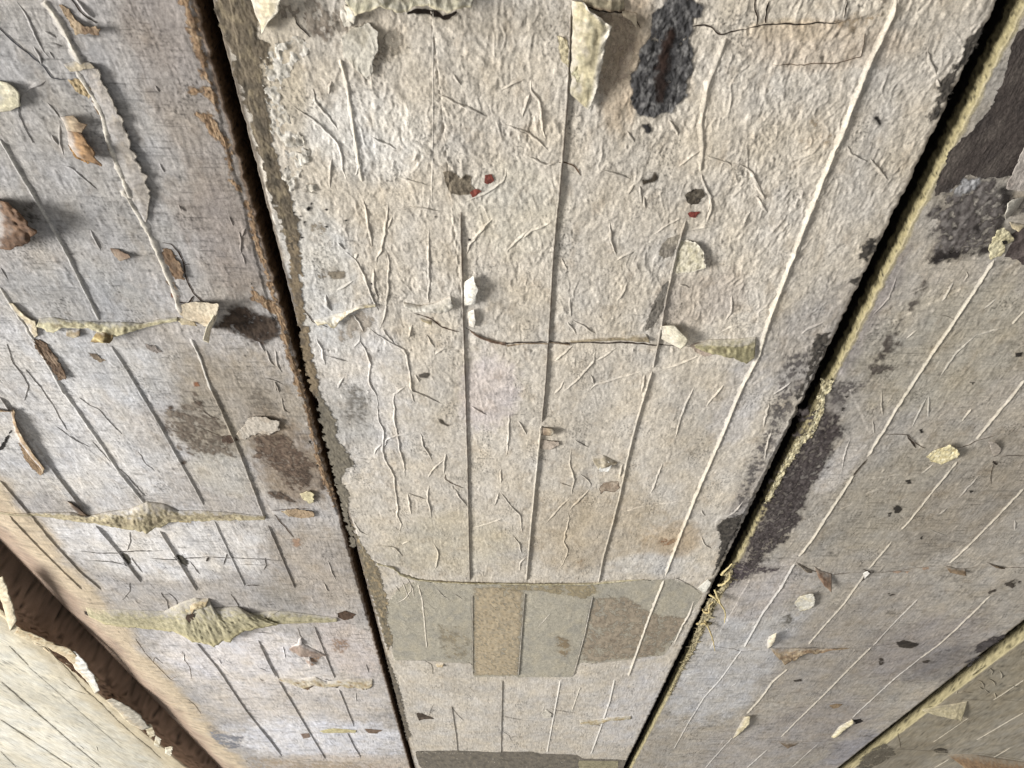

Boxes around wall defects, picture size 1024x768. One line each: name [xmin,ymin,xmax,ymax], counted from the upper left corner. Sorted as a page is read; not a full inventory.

mould [630,0,704,134]
crack [692,0,848,36]
peeling [61,61,151,222]
peeling [0,201,37,250]
mould [927,176,1024,264]
spalling [178,0,744,740]
crack [463,276,690,349]
water stain [726,333,901,587]